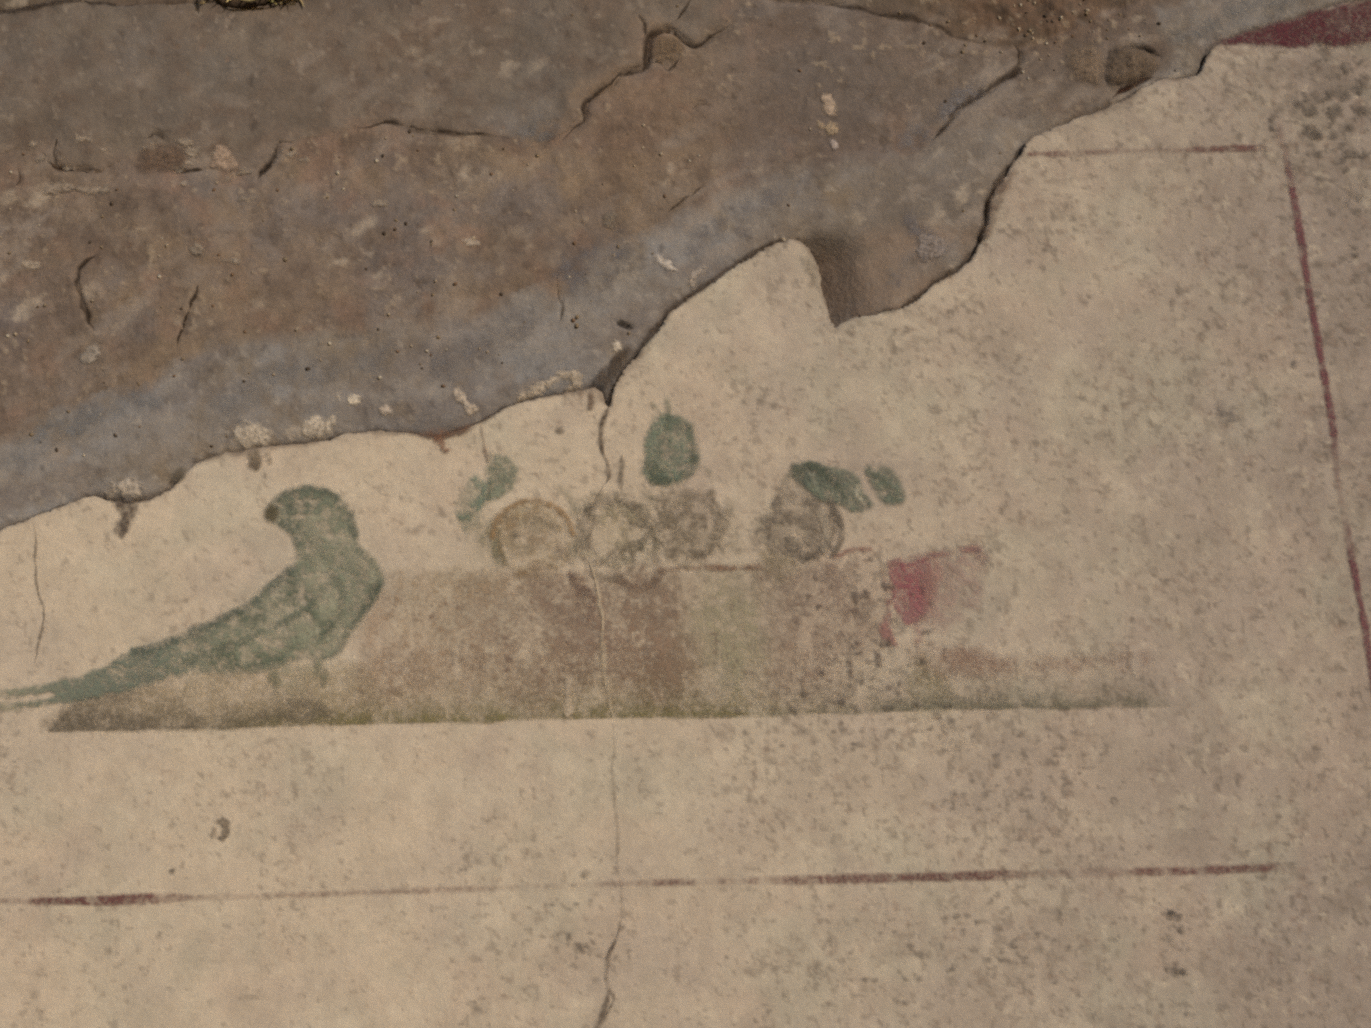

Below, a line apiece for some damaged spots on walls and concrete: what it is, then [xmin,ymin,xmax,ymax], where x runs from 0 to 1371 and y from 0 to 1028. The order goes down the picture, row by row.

crack [570,0,716,132]
spalling [0,0,1364,530]
crack [600,406,623,481]
crack [590,562,613,715]